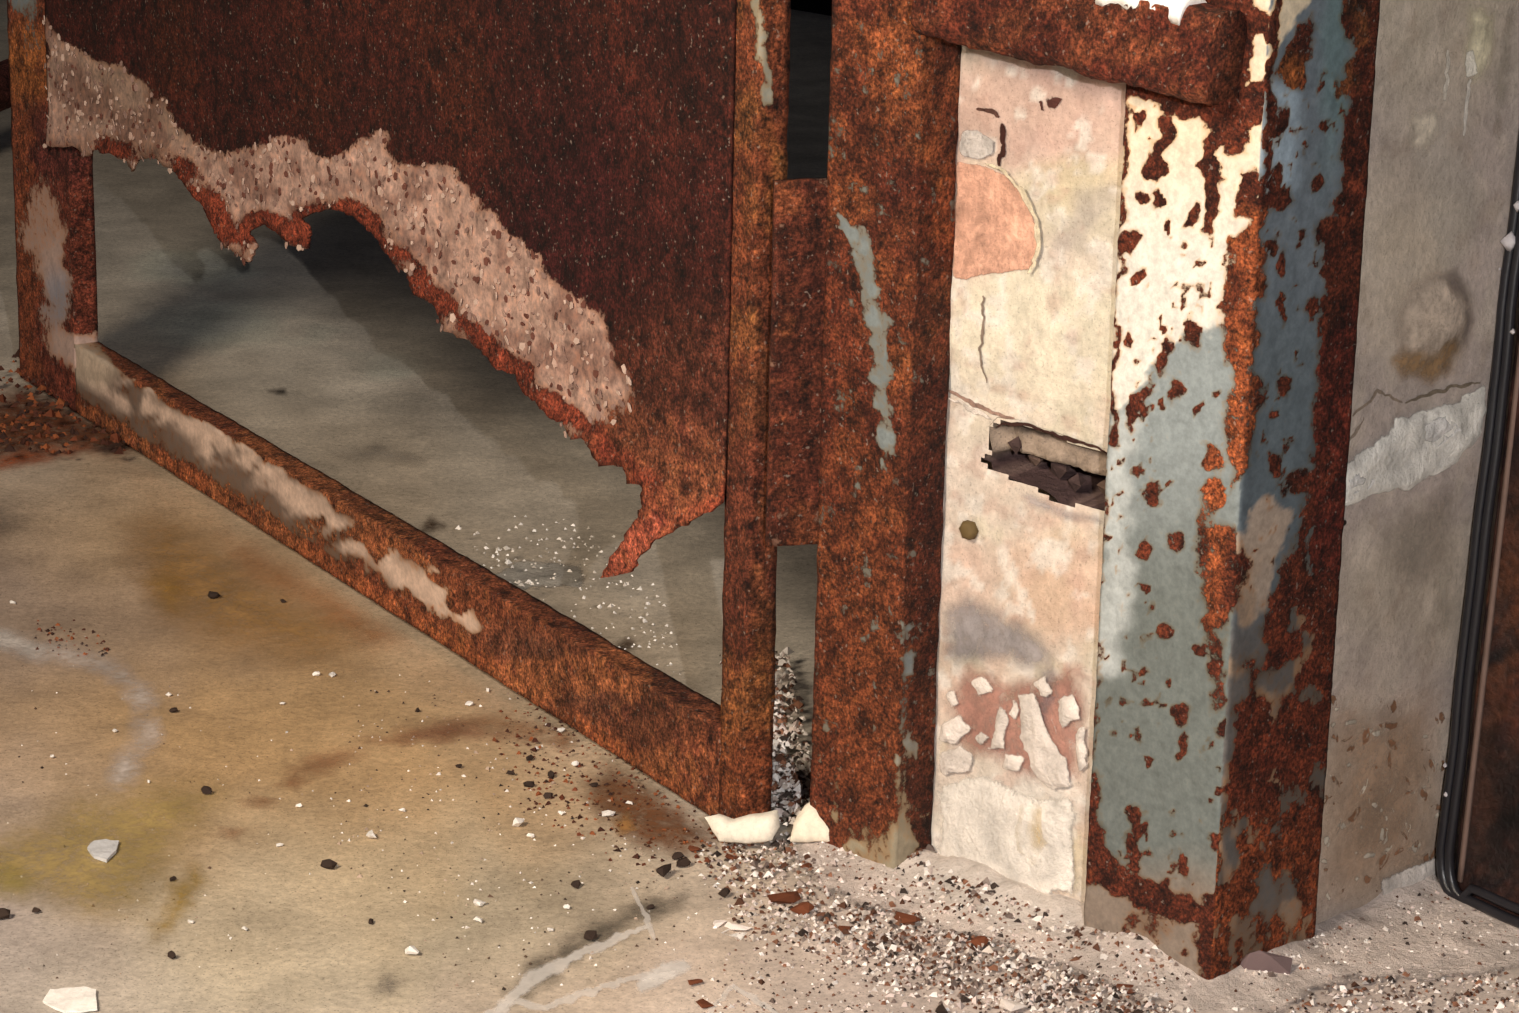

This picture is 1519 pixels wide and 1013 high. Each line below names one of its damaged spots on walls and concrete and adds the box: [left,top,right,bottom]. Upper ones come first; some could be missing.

corrosion [42,15,632,425]
corrosion [0,392,129,464]
spalling [983,417,1107,517]
crack [1350,382,1480,440]
peeling [939,671,1087,795]
corrosion [594,775,703,849]